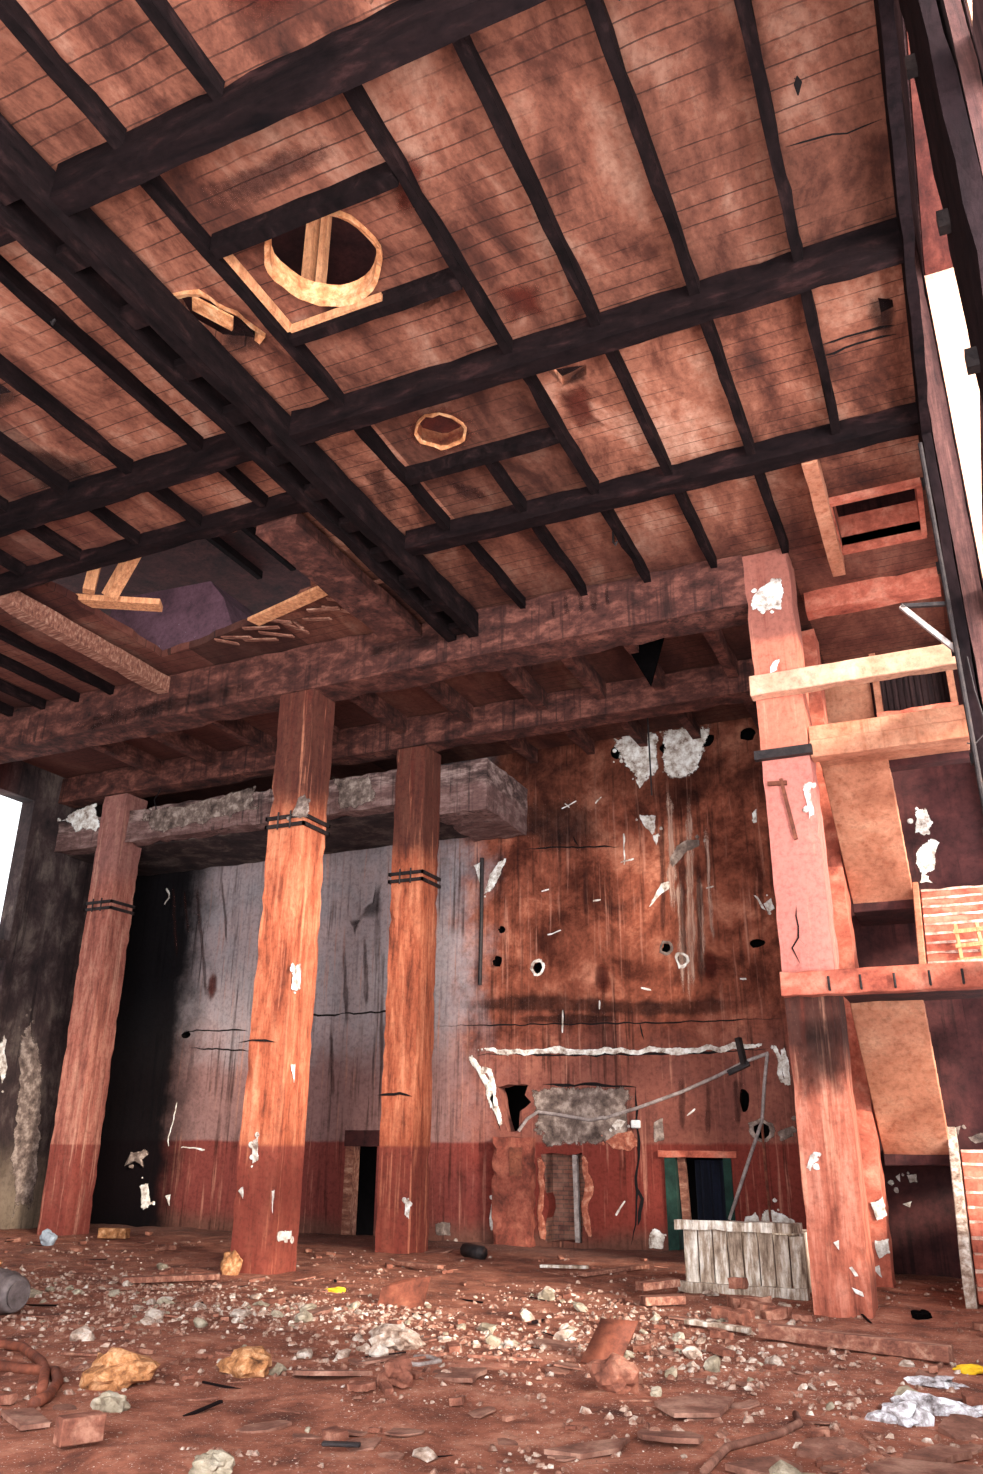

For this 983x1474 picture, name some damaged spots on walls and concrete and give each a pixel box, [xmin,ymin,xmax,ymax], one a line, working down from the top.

peeling [751,578,784,614]
peeling [611,727,714,788]
spalling [57,803,100,832]
peeling [907,807,940,883]
spalling [469,1042,791,1125]
flaking render [532,1086,664,1240]